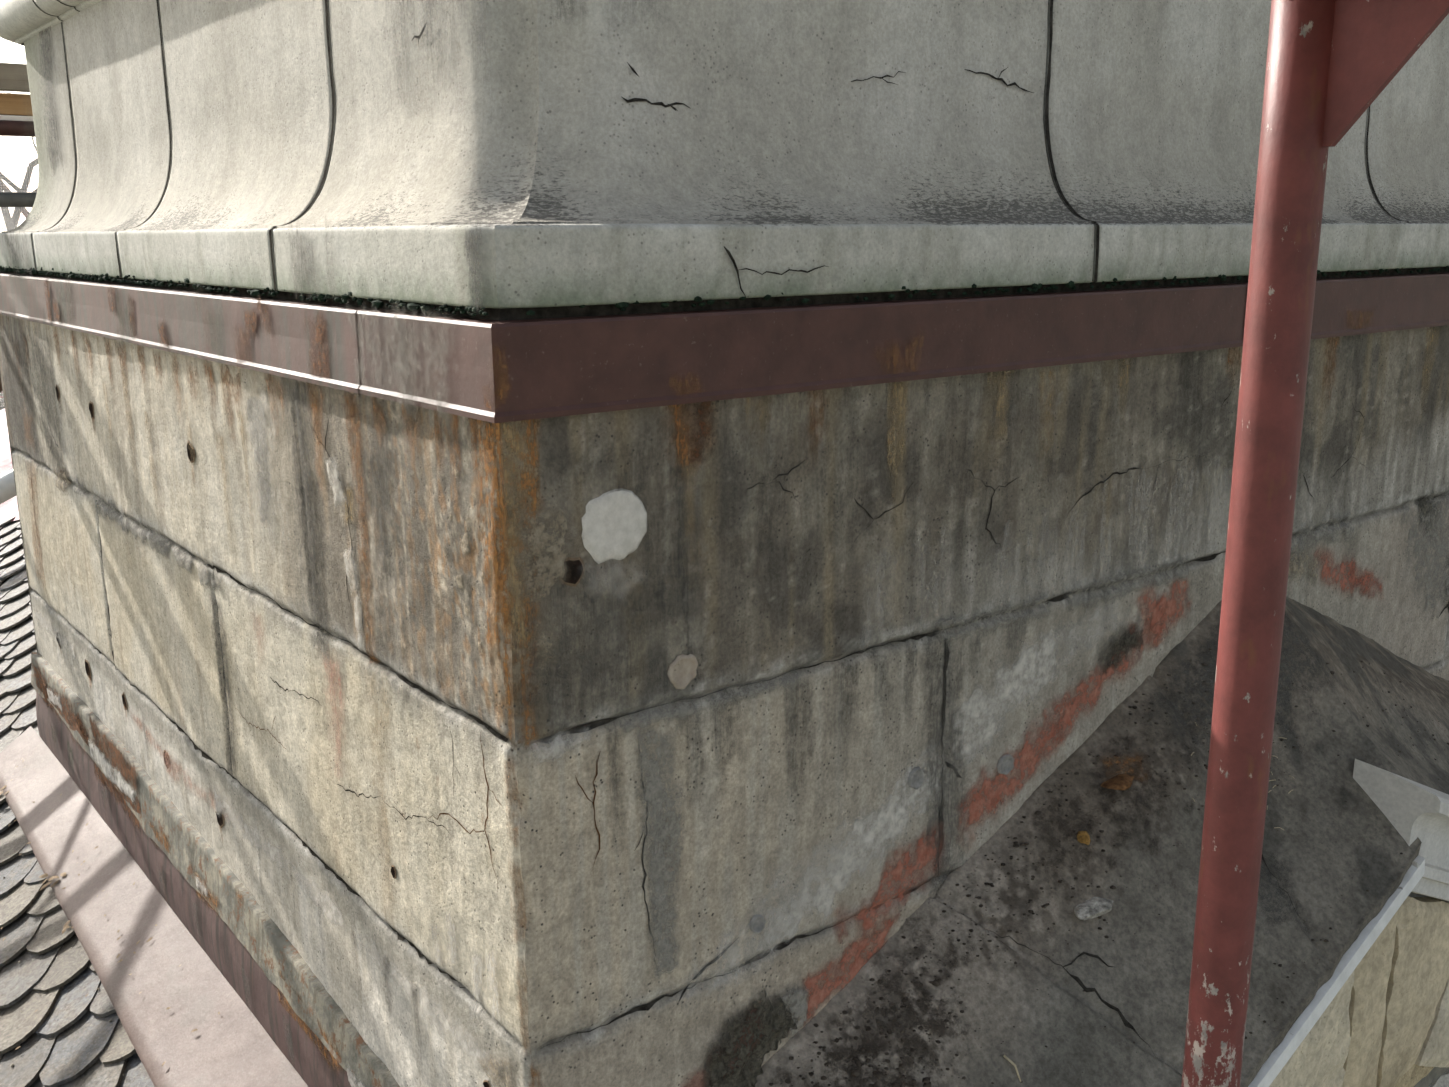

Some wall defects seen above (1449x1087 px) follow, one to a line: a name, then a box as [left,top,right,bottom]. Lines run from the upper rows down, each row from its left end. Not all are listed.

crack [621,62,691,111]
crack [851,71,906,85]
crack [964,67,1033,93]
water stain [1,324,63,474]
rust [44,281,268,445]
rust [309,316,330,476]
water stain [282,377,342,701]
rust [434,350,540,746]
rust [33,665,170,853]
crack [92,404,1226,1076]
water stain [953,613,1099,760]
water stain [759,745,942,951]